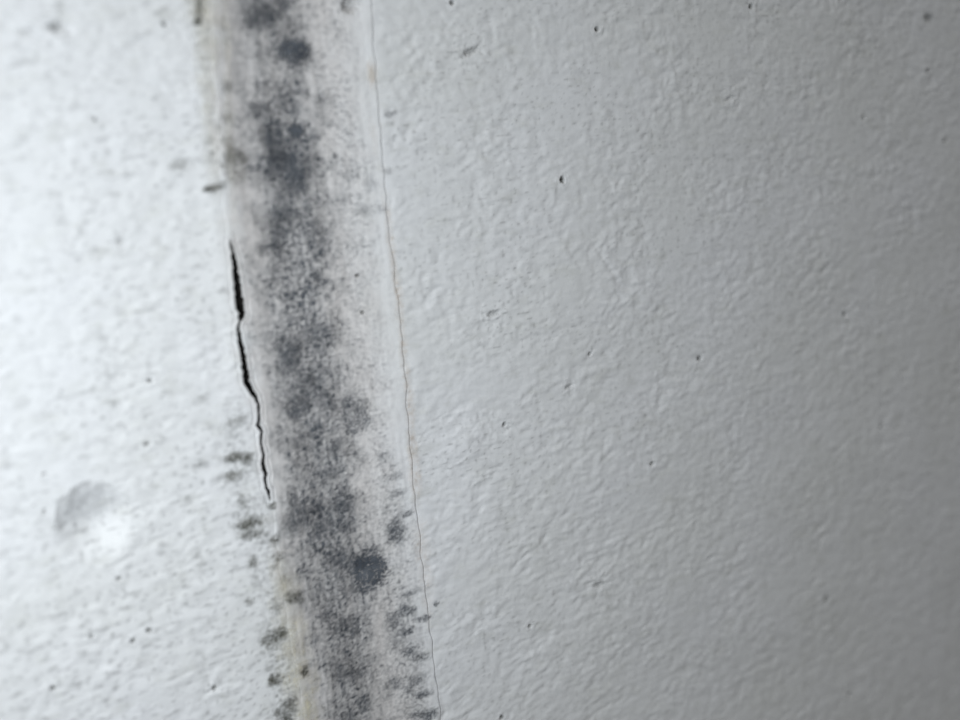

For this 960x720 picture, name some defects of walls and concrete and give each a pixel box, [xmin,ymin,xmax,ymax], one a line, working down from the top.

crack [225,233,275,507]
mould [248,7,387,596]